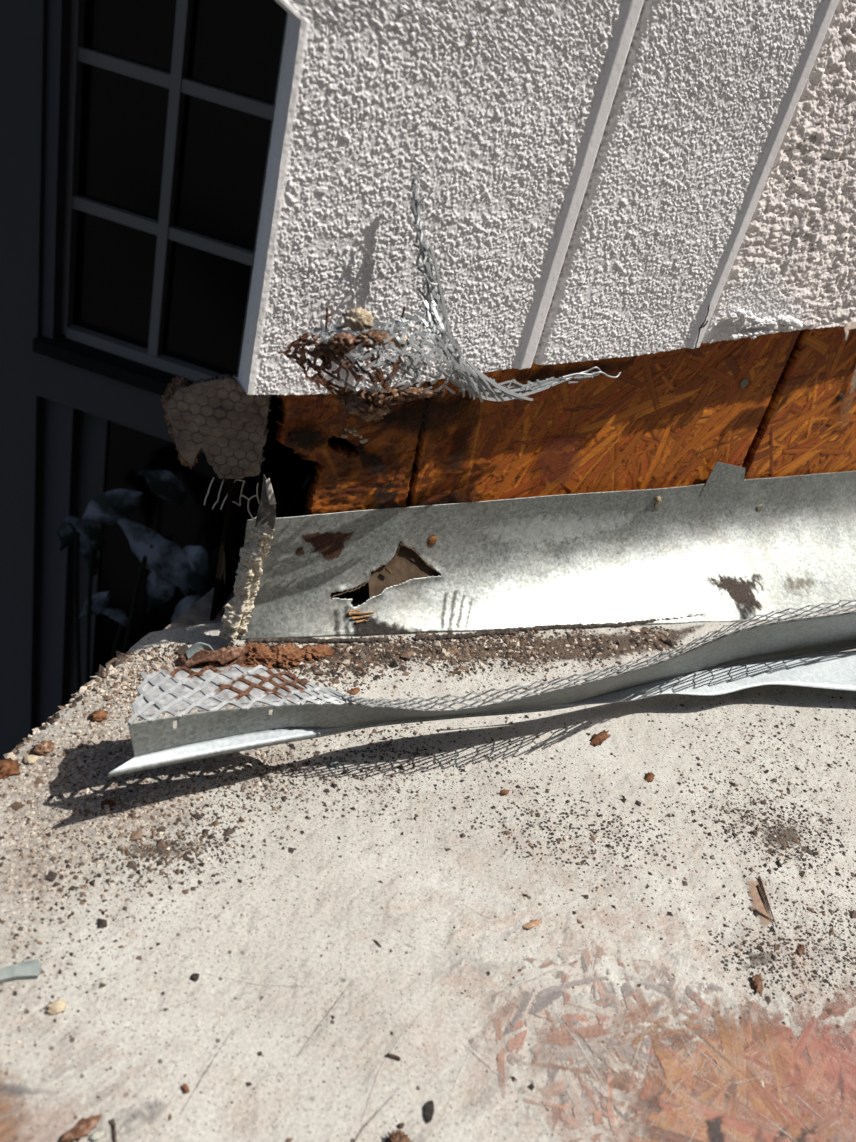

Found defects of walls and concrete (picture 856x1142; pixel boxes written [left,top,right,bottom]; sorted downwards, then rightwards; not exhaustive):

flaking render [727,309,803,340]
peeling [844,321,856,341]
rust [296,532,353,560]
peeling [369,542,441,598]